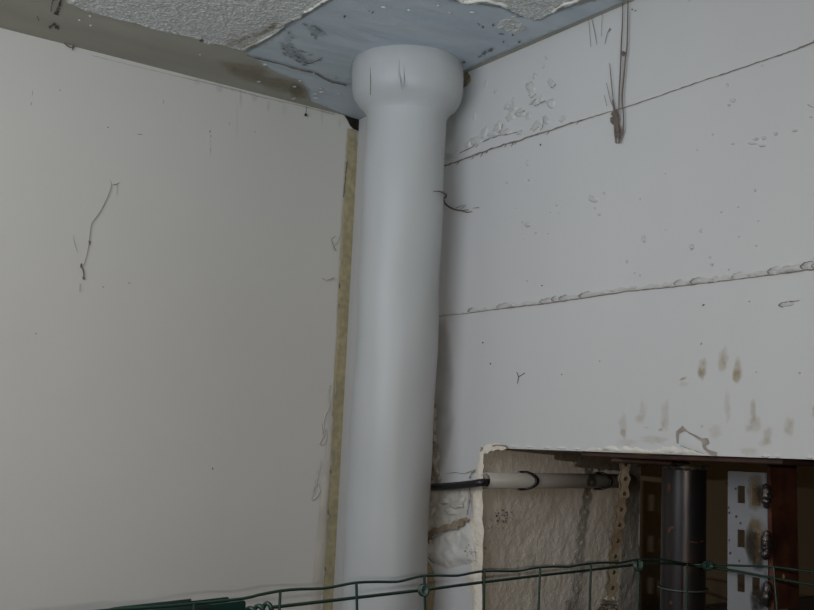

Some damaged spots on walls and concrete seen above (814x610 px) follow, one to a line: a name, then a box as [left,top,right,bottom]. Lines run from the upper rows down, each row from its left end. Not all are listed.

crack [444,42,814,167]